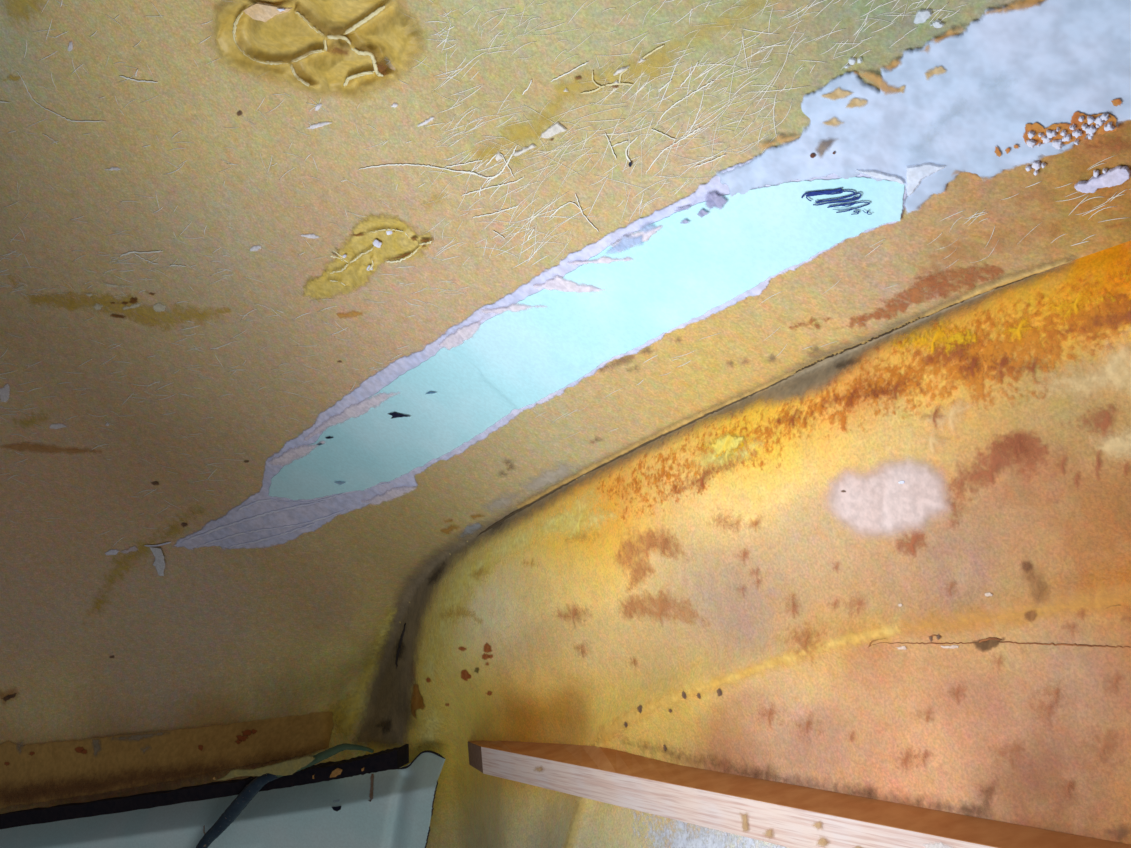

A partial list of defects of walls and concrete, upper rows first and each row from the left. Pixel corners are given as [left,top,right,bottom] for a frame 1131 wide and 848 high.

spalling [995,99,1122,157]
leakage [13,283,229,330]
corrosion [850,265,1003,327]
peeling [105,157,907,576]
peeling [1052,345,1131,395]
corrosion [597,290,1131,519]
peeling [1100,431,1131,457]
peeling [829,462,945,534]
corrosion [619,532,678,583]
corrosion [461,643,493,681]
crack [868,635,1131,651]